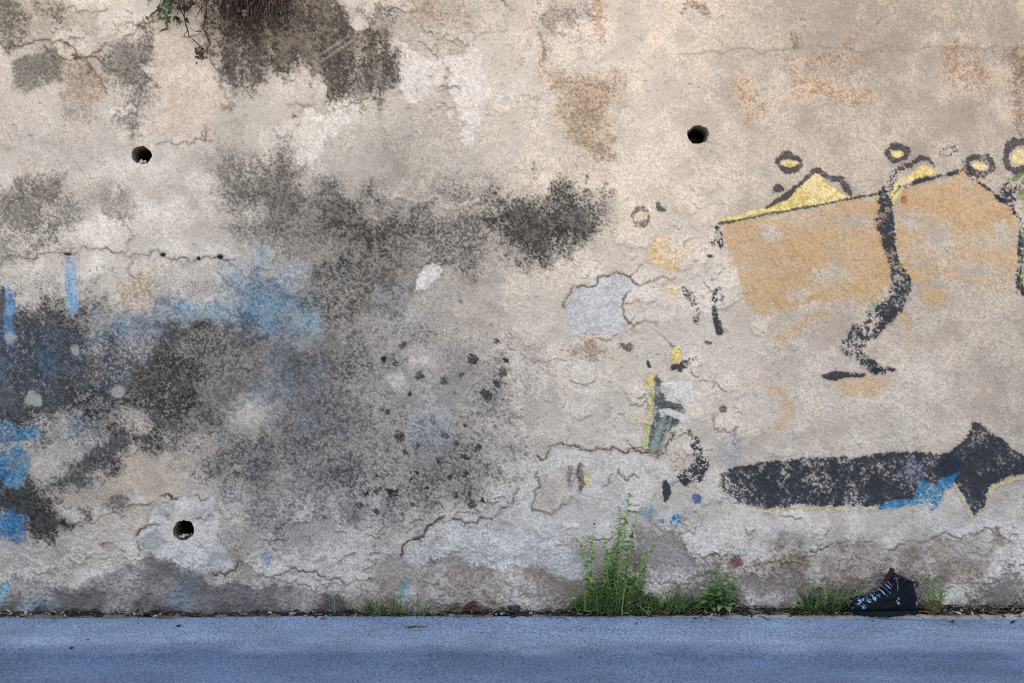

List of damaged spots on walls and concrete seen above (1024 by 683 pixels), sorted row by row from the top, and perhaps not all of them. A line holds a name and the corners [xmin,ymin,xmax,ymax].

crack [0,214,226,279]
leakage [0,0,623,617]
spalling [566,273,626,335]
crack [134,492,244,578]
crack [271,551,358,585]
crack [398,430,678,565]